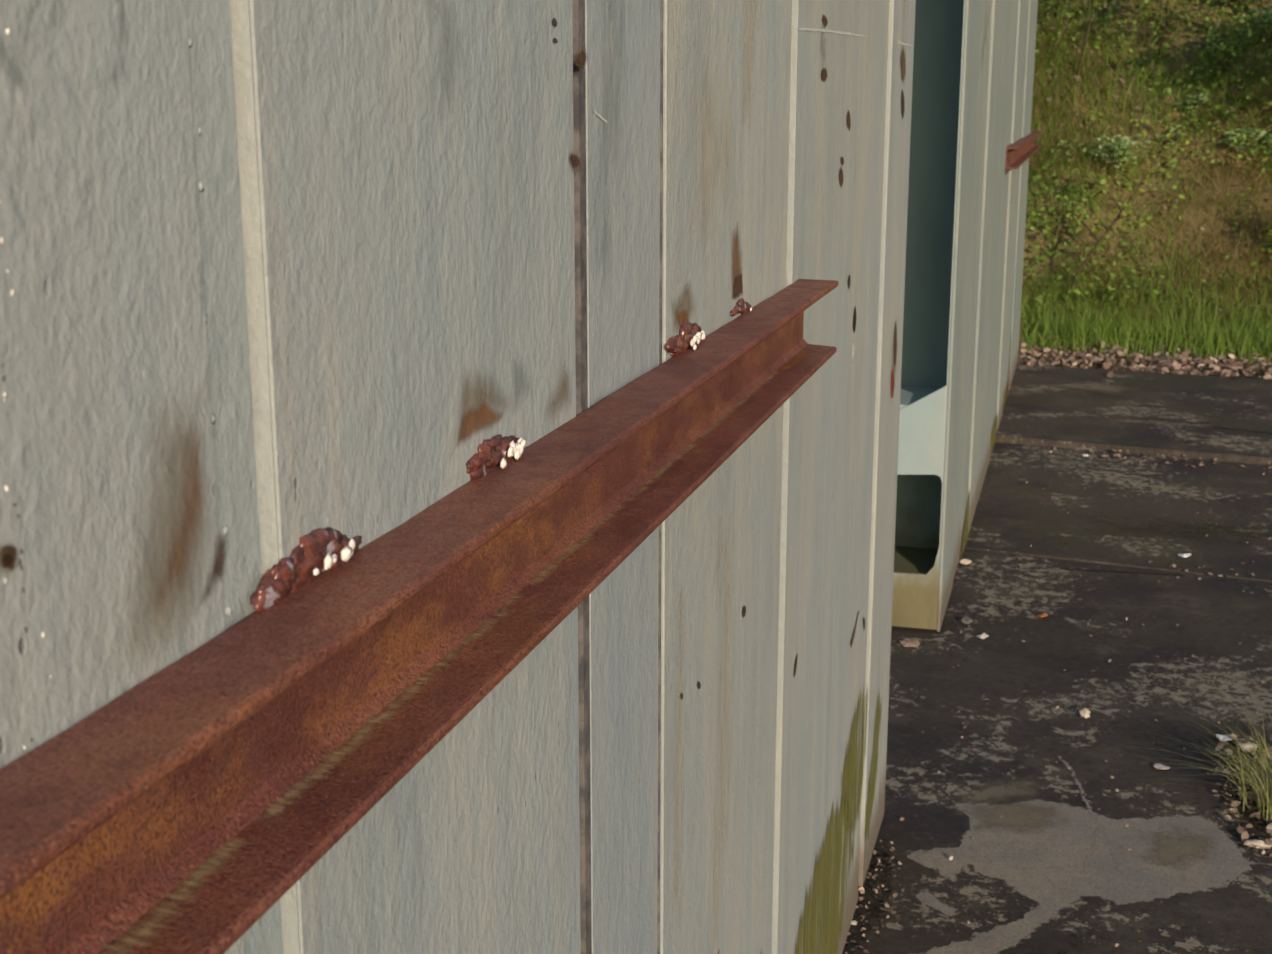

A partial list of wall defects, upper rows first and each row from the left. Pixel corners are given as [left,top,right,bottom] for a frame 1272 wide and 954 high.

rust [733,234,743,298]
rust [675,290,691,327]
rust [459,387,499,440]
rust [0,546,16,570]
rust [208,541,225,592]
leakage [795,688,882,954]